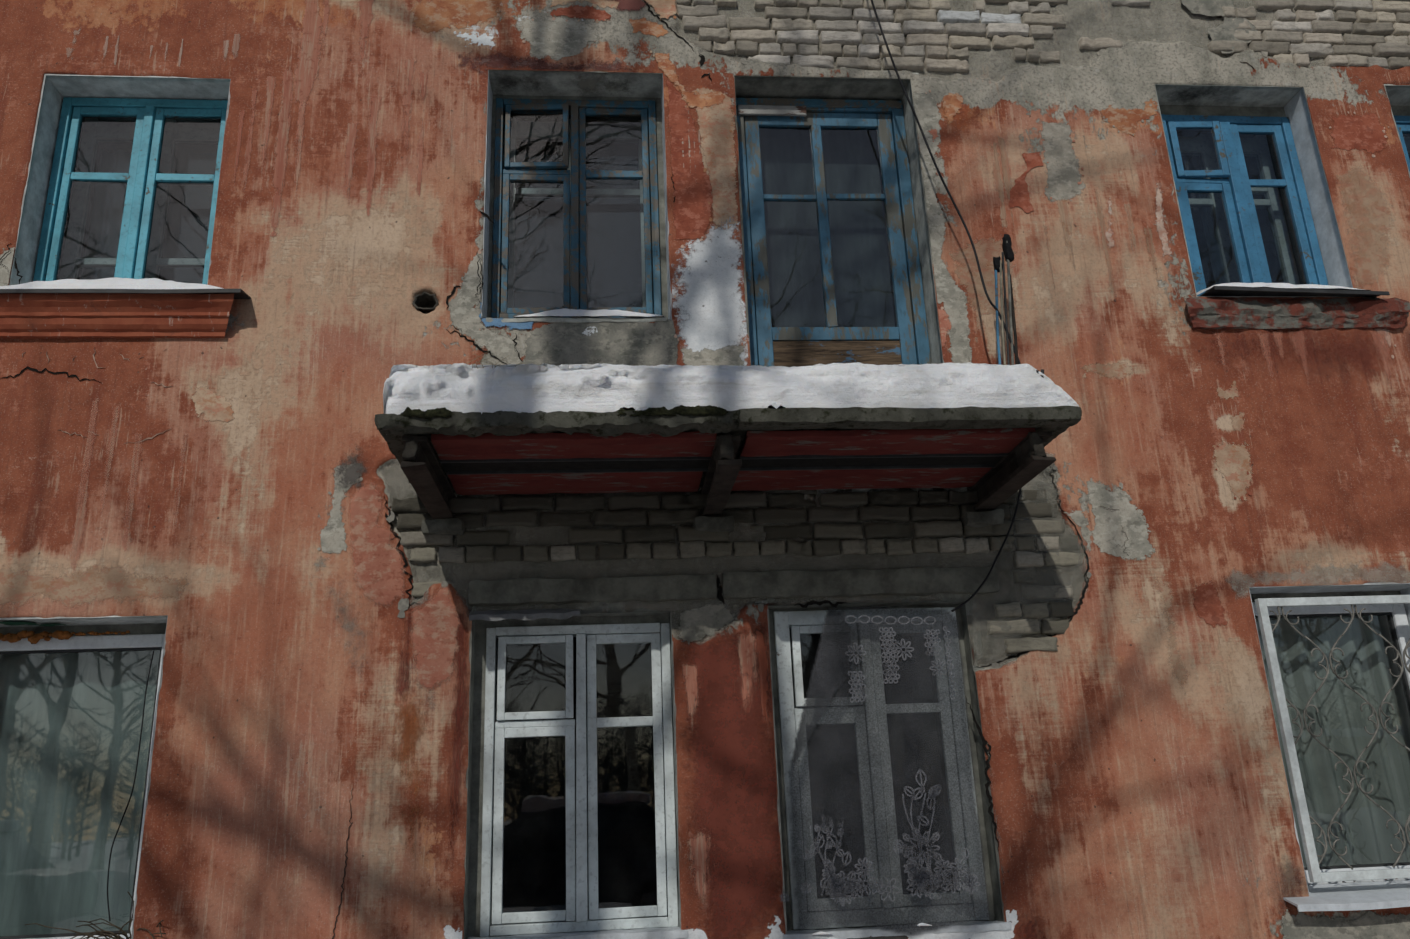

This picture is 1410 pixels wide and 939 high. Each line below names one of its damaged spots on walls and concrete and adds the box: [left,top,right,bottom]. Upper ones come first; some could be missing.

spalling [1207,0,1410,69]
peeling [1100,98,1158,137]
spalling [410,0,1068,366]
peeling [1009,121,1086,213]
peeling [1154,183,1172,256]
crack [2,366,99,382]
spalling [384,489,1098,668]
peeling [443,925,462,939]
peeling [678,928,707,939]
peeling [765,916,784,939]
peeling [828,909,1018,939]